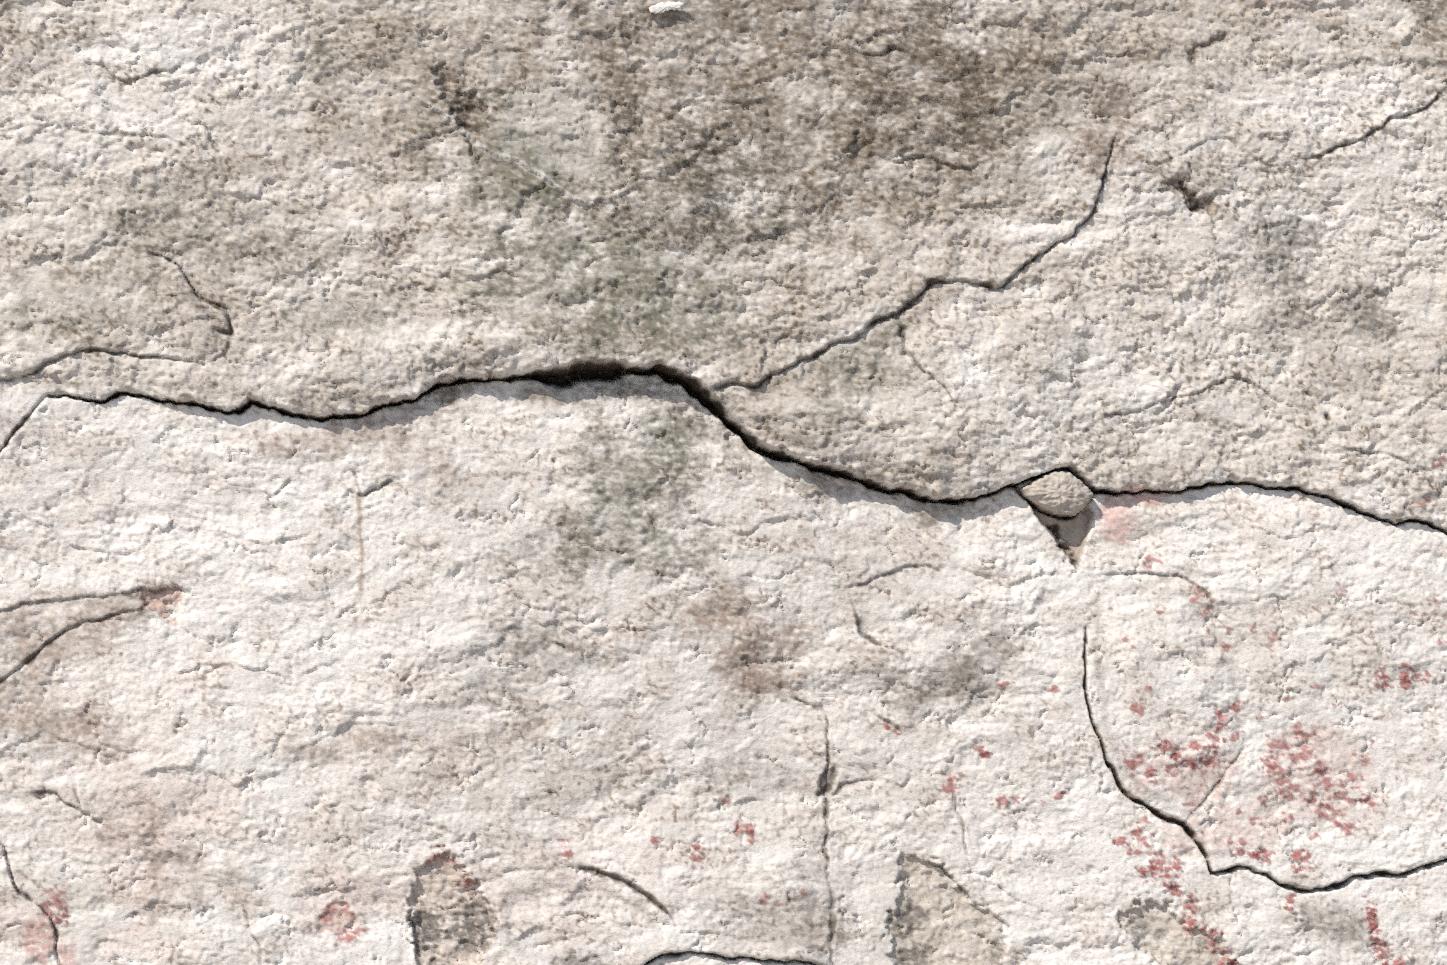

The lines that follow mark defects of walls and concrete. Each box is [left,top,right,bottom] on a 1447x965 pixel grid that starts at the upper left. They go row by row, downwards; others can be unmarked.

crack [157,255,233,335]
damp [470,99,771,354]
crack [870,279,946,370]
crack [980,148,1112,289]
damp [1282,221,1316,318]
crack [0,348,1446,535]
spalling [1031,507,1092,565]
crack [1,631,65,682]
crack [822,719,830,860]
crack [1083,634,1447,892]
crack [584,868,667,912]
crack [644,952,815,965]